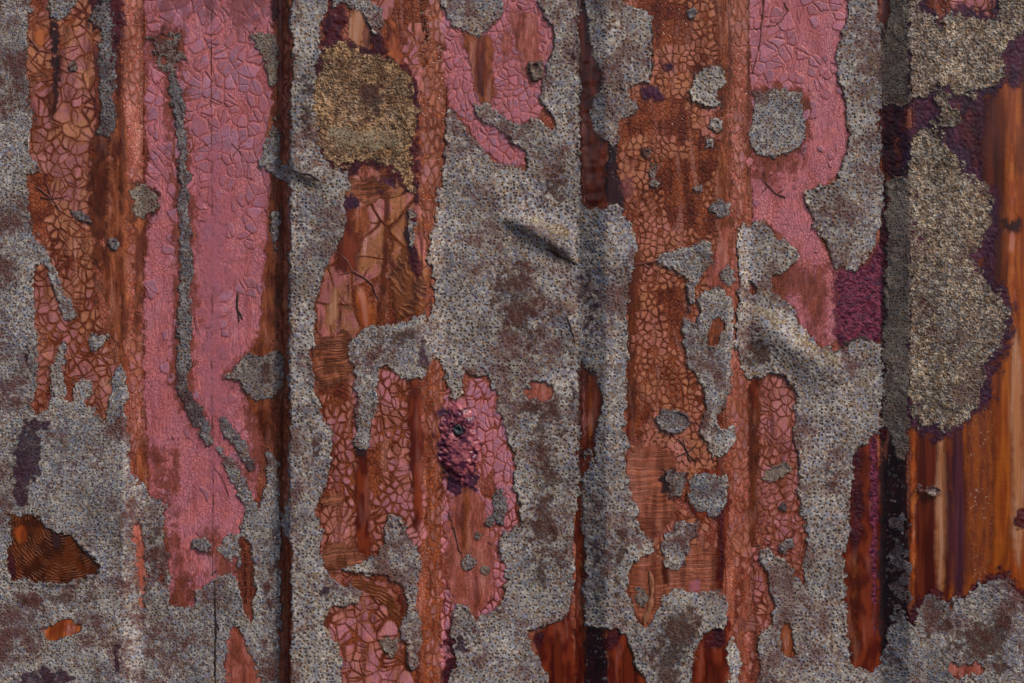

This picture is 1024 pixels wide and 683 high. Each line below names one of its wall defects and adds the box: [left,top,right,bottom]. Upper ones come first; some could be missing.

corrosion [6,514,98,641]
peeling [0,0,423,683]
crack [25,0,555,683]
peeling [347,0,742,683]
corrosion [606,529,732,683]
crack [616,0,875,683]
peeling [655,0,1024,683]
corrosion [756,0,1024,678]